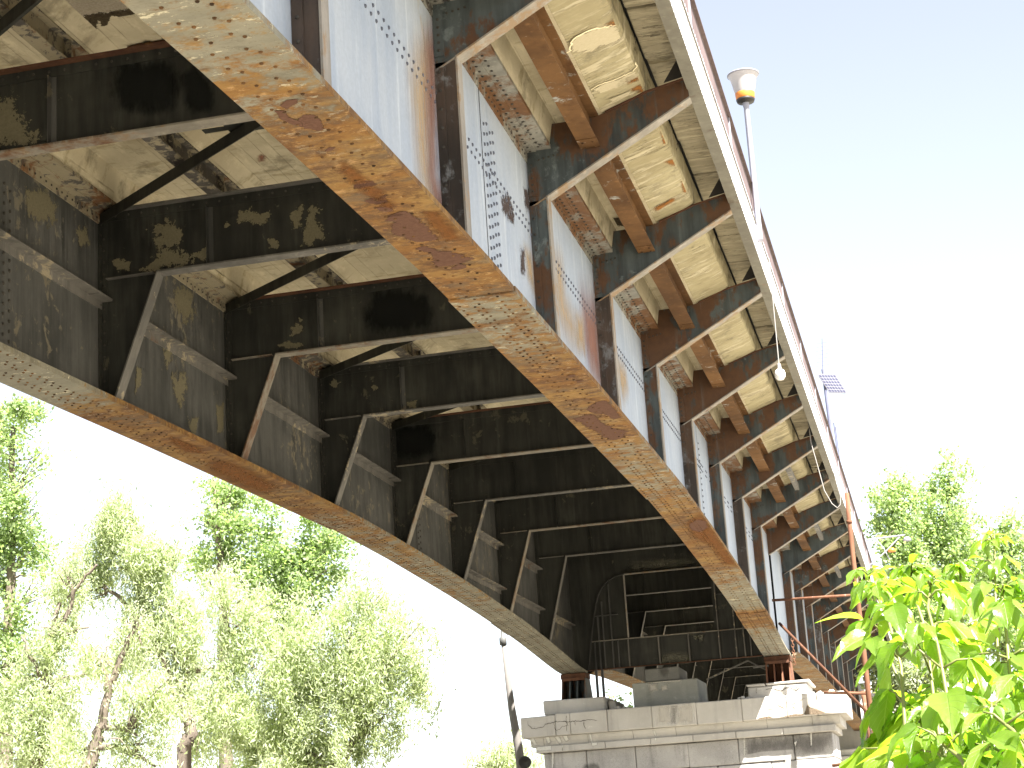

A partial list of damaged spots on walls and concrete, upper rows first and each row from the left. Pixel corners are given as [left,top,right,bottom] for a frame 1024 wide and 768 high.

leakage [115,61,212,112]
peeling [0,95,42,153]
corrosion [416,43,458,240]
peeling [23,186,60,227]
peeling [112,217,206,273]
peeling [224,206,271,228]
peeling [289,204,325,247]
corrosion [558,270,600,376]
corrosion [688,516,736,565]
crack [528,716,597,731]